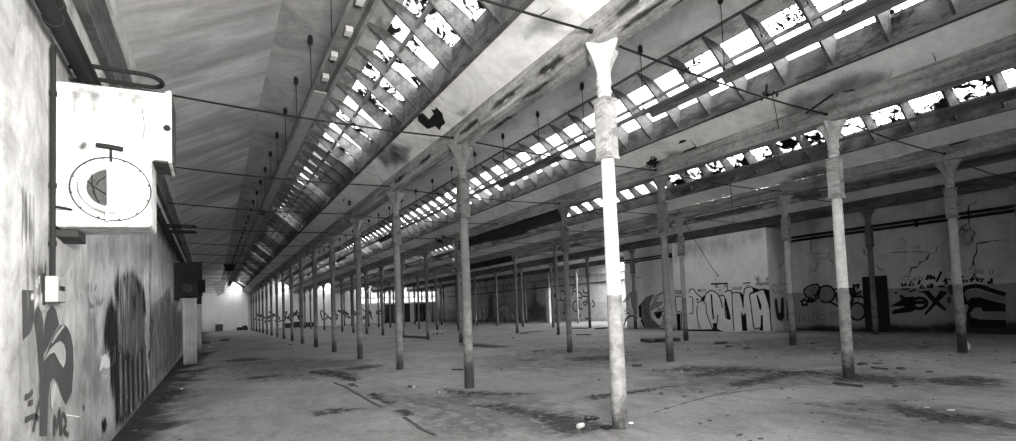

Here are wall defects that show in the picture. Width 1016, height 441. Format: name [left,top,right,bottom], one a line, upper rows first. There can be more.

crack [862,199,999,281]